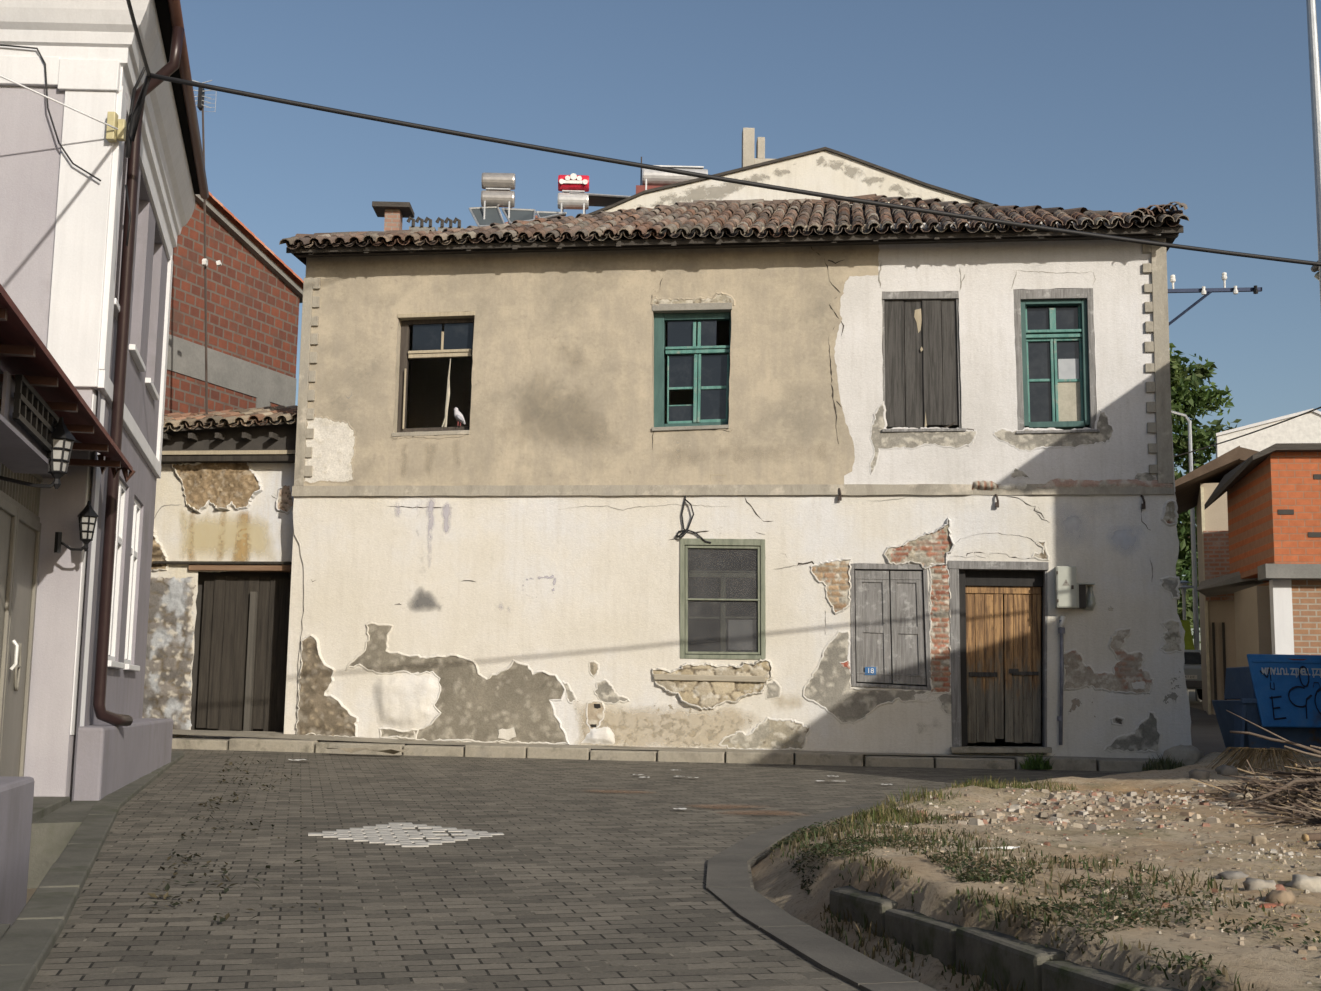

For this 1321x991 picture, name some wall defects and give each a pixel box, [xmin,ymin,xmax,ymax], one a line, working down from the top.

damp [188,514,266,561]
flaking render [171,455,294,514]
flaking render [809,558,852,615]
flaking render [882,518,955,703]
flaking render [295,622,812,751]
flaking render [1063,619,1184,726]